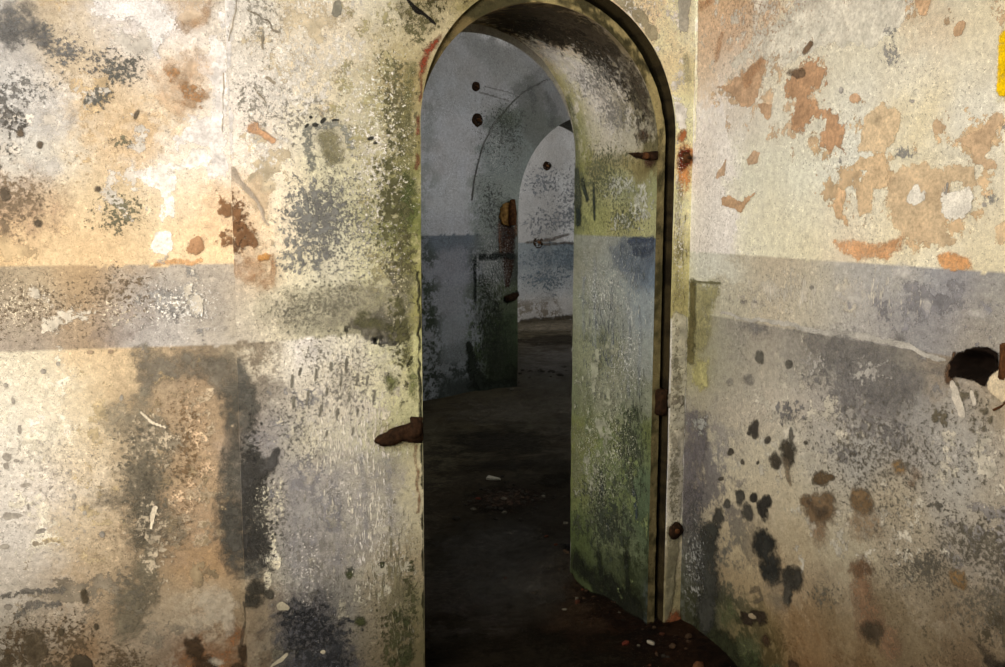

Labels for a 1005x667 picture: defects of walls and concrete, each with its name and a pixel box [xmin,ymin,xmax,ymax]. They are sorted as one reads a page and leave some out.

leakage [0,1,152,246]
leakage [0,225,674,667]
crack [407,0,436,25]
rust [498,212,517,288]
leakage [459,90,595,383]
peeling [614,0,691,52]
rust [678,130,693,192]
peeling [698,0,1005,254]
spalling [720,242,1005,448]